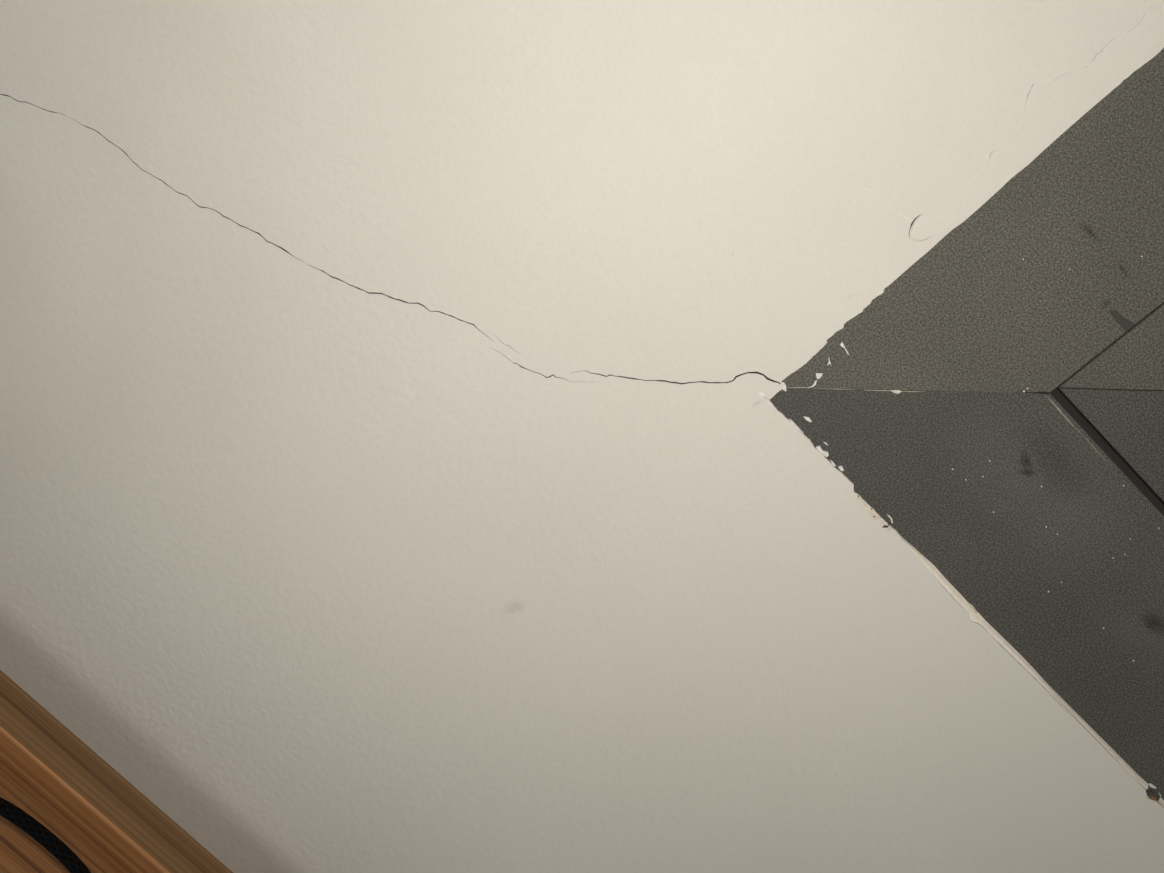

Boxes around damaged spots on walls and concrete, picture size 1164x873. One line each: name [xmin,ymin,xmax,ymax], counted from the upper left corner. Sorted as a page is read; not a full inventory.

crack [0,94,781,384]
spalling [816,442,844,471]
spalling [855,493,893,531]